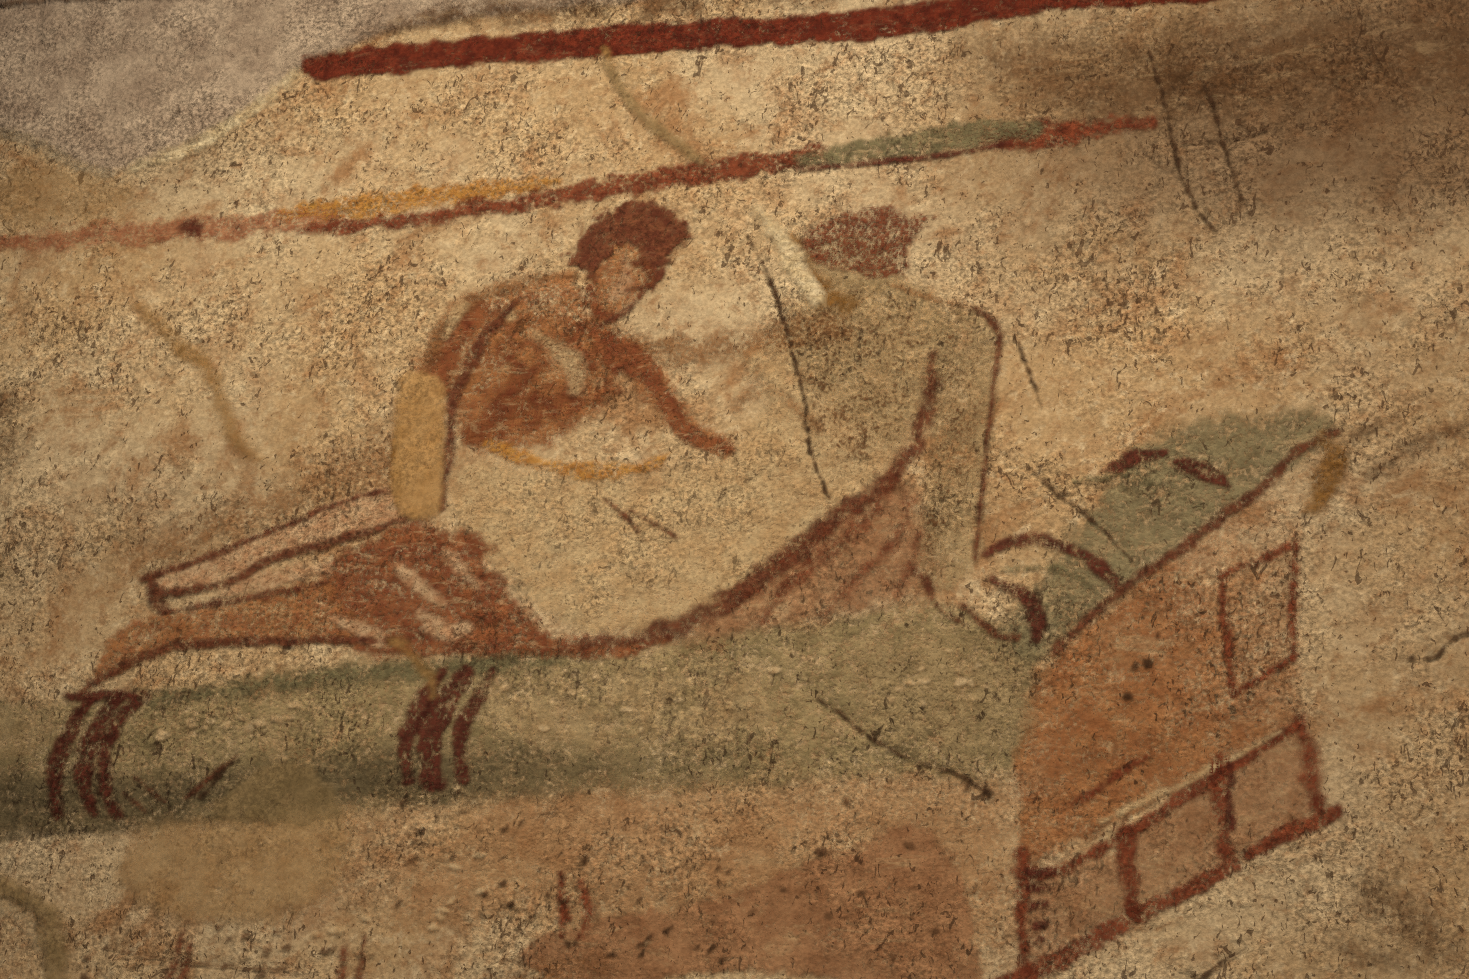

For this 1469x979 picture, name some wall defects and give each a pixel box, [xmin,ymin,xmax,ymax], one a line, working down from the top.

crack [746,207,848,498]
crack [1008,454,1132,560]
crack [817,698,981,789]